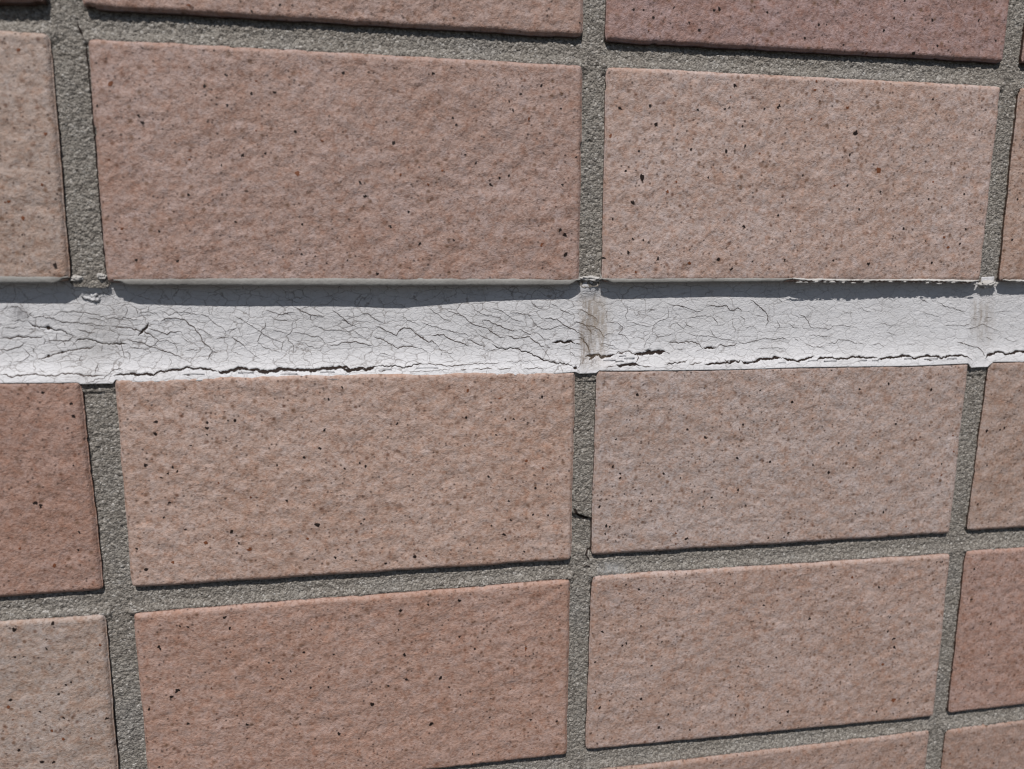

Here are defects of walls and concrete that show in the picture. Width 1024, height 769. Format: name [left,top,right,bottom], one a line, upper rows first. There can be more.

crack [0,297,1024,384]